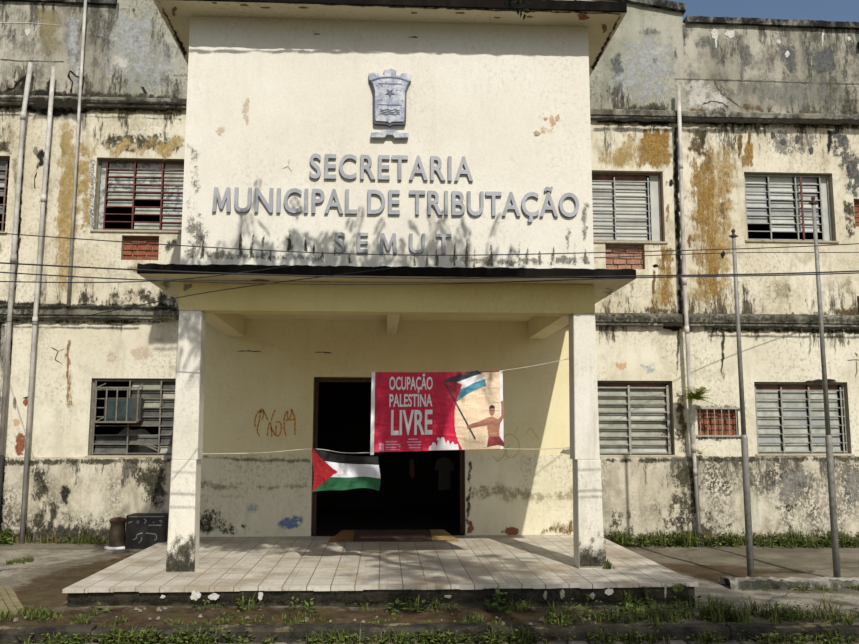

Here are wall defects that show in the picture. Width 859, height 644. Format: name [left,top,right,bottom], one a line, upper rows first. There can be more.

leakage [0,1,199,290]
peeling [534,114,560,136]
leakage [220,0,859,379]
leakage [184,207,335,262]
leakage [0,283,178,372]
flaking render [13,397,28,456]
leakage [465,461,573,522]
leakage [604,393,859,543]
mould [166,509,246,572]